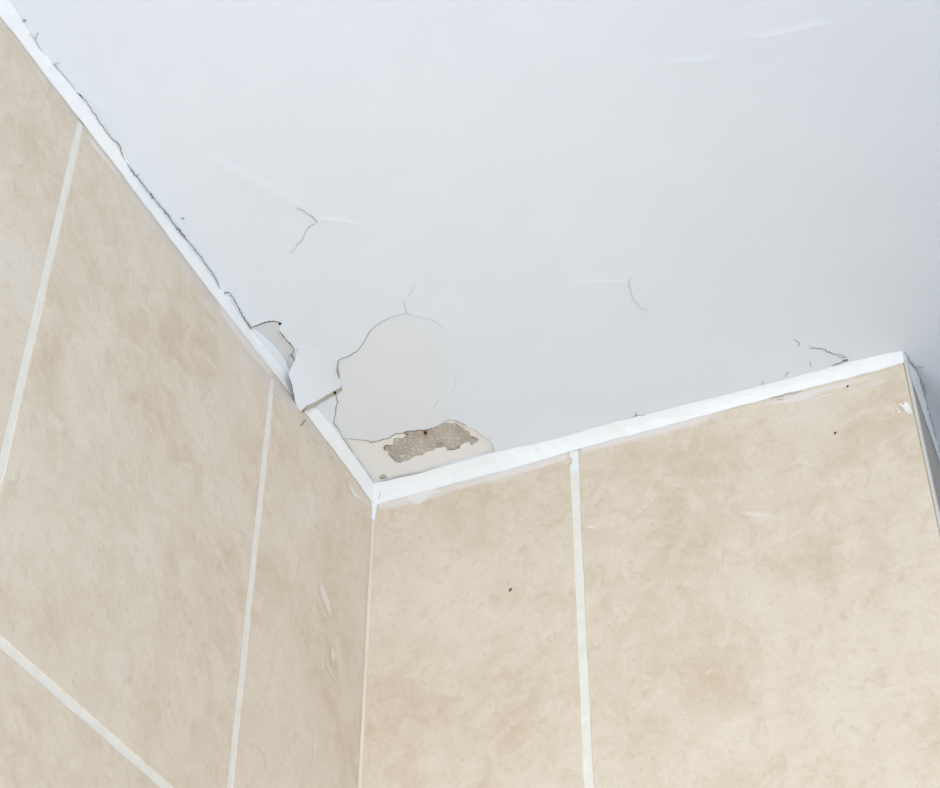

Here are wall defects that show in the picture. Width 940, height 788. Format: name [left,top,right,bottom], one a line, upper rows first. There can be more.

crack [22,19,251,329]
peeling [251,314,494,482]
crack [785,339,848,376]